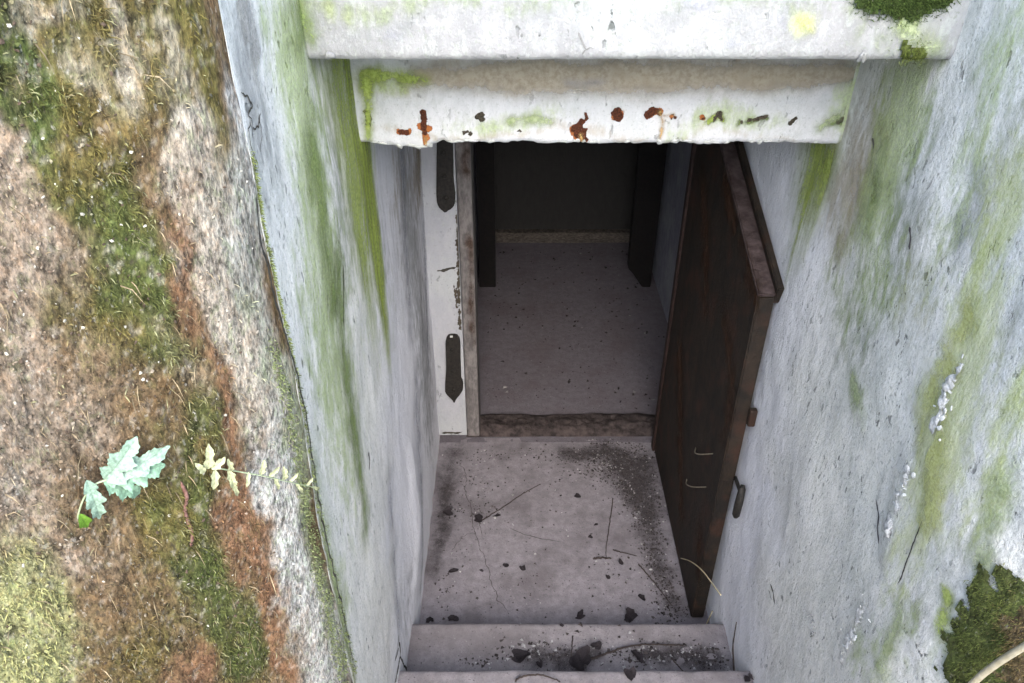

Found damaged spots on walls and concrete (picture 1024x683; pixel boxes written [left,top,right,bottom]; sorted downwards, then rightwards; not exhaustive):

rust [396,109,432,146]
rust [570,112,589,142]
rust [611,107,624,122]
rust [644,106,677,138]
damp [347,60,387,336]
crack [241,92,357,683]
crack [452,466,508,612]
crack [898,521,922,583]